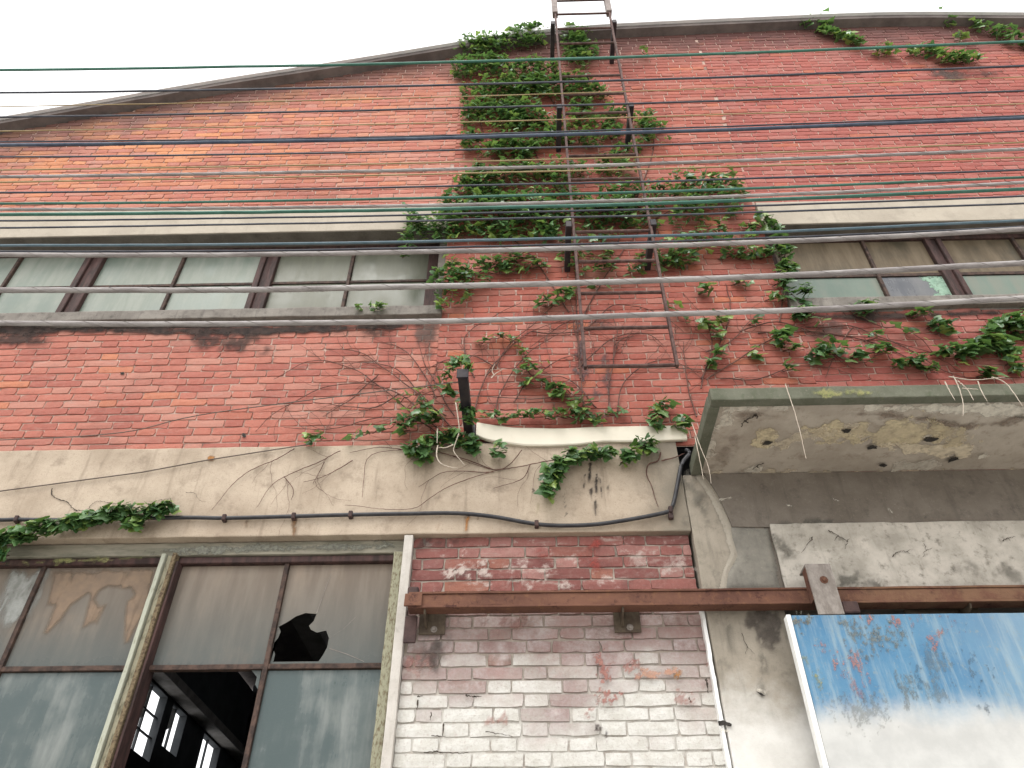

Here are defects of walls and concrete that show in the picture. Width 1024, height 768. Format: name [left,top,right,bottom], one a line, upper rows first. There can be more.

damp [0,324,437,355]
peeling [706,406,788,458]
peeling [750,402,1024,472]
damp [583,463,609,514]
damp [746,611,781,648]
peeling [585,649,692,718]